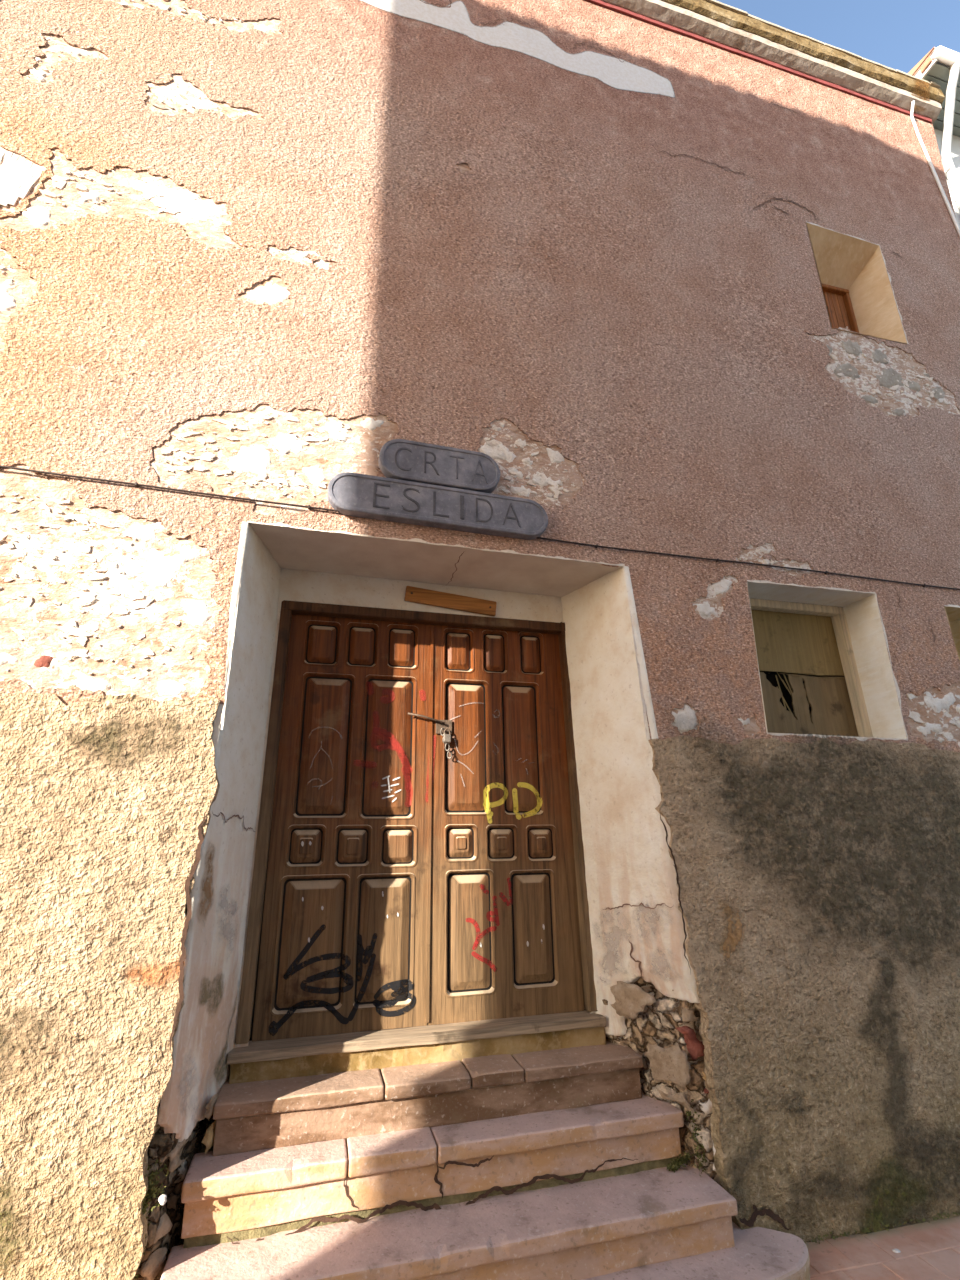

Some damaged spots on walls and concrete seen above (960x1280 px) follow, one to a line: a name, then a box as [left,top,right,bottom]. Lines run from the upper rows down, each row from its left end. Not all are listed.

peeling [361,0,674,97]
flaking render [0,147,248,250]
flaking render [809,326,960,418]
flaking render [150,404,398,515]
flaking render [478,418,584,507]
flaking render [0,464,222,701]
water stain [73,720,179,763]
flaking render [906,679,960,747]
crack [170,810,255,1053]
water stain [705,733,960,1230]
flaking render [602,978,721,1186]
crack [227,1156,638,1244]